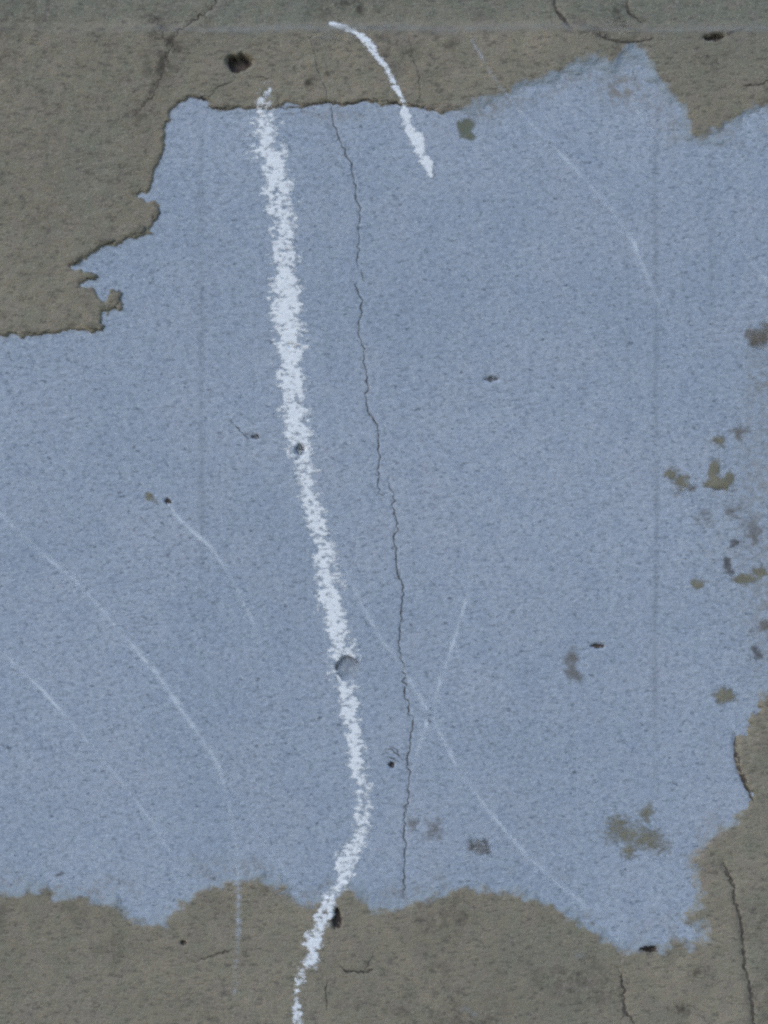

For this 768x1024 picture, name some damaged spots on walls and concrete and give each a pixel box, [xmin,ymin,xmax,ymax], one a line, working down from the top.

crack [279,38,440,896]
crack [733,737,753,801]
crack [723,864,755,1024]